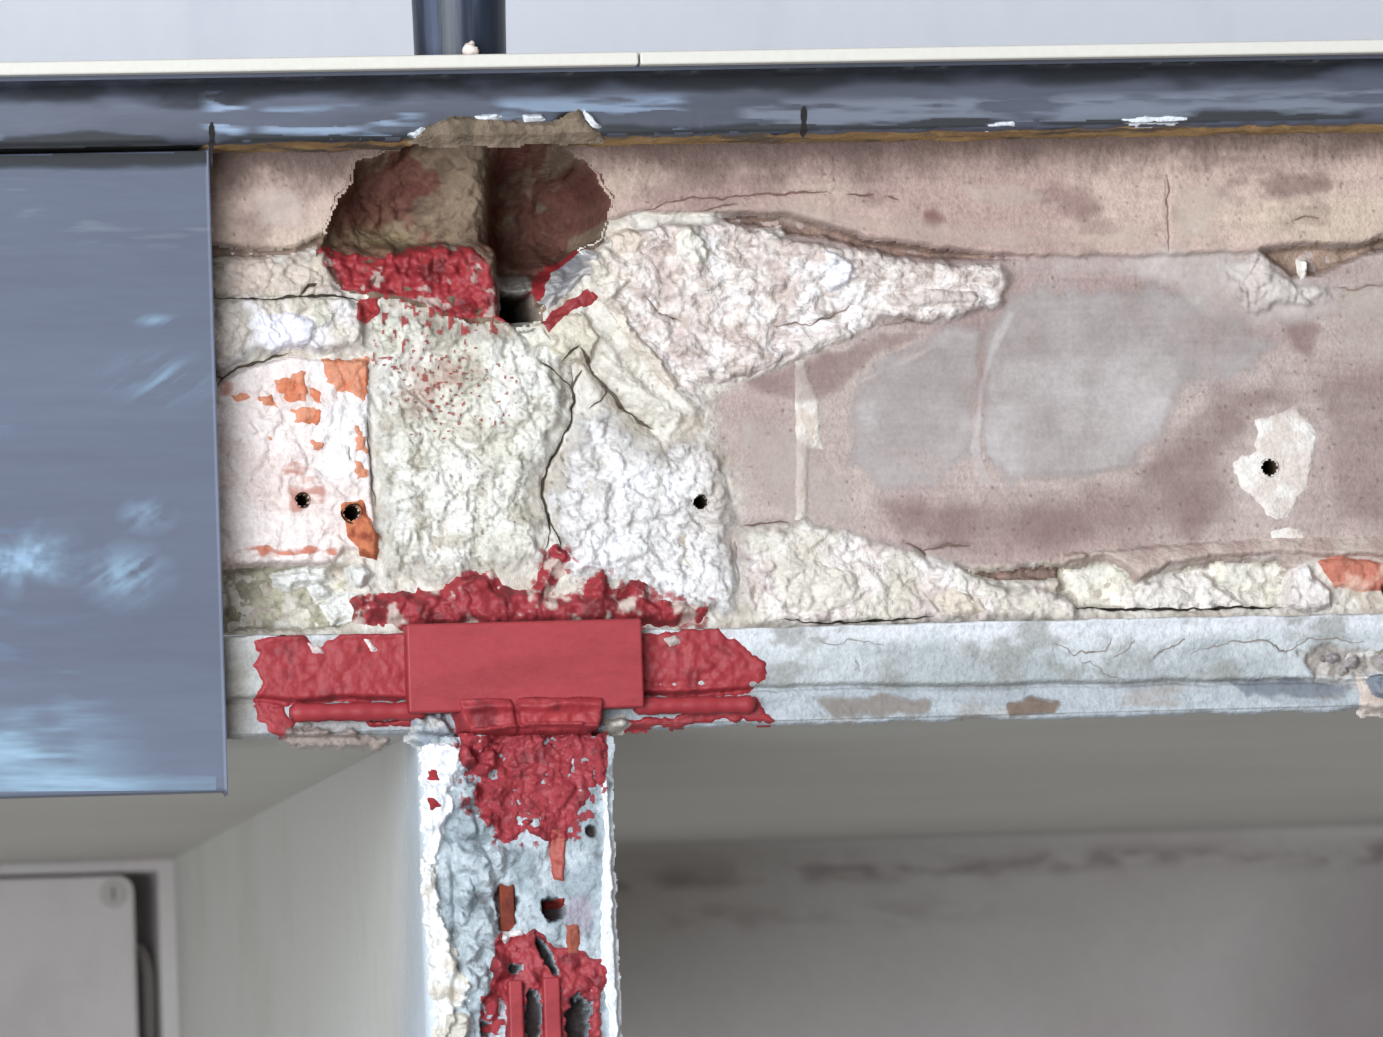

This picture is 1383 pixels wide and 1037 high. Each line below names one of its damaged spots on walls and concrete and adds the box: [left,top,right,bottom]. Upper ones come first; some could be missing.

crack [643,191,898,213]
crack [538,344,654,550]
spalling [209,100,1383,626]
spalling [222,546,346,654]
peeling [664,635,680,646]
spalling [418,735,623,1037]